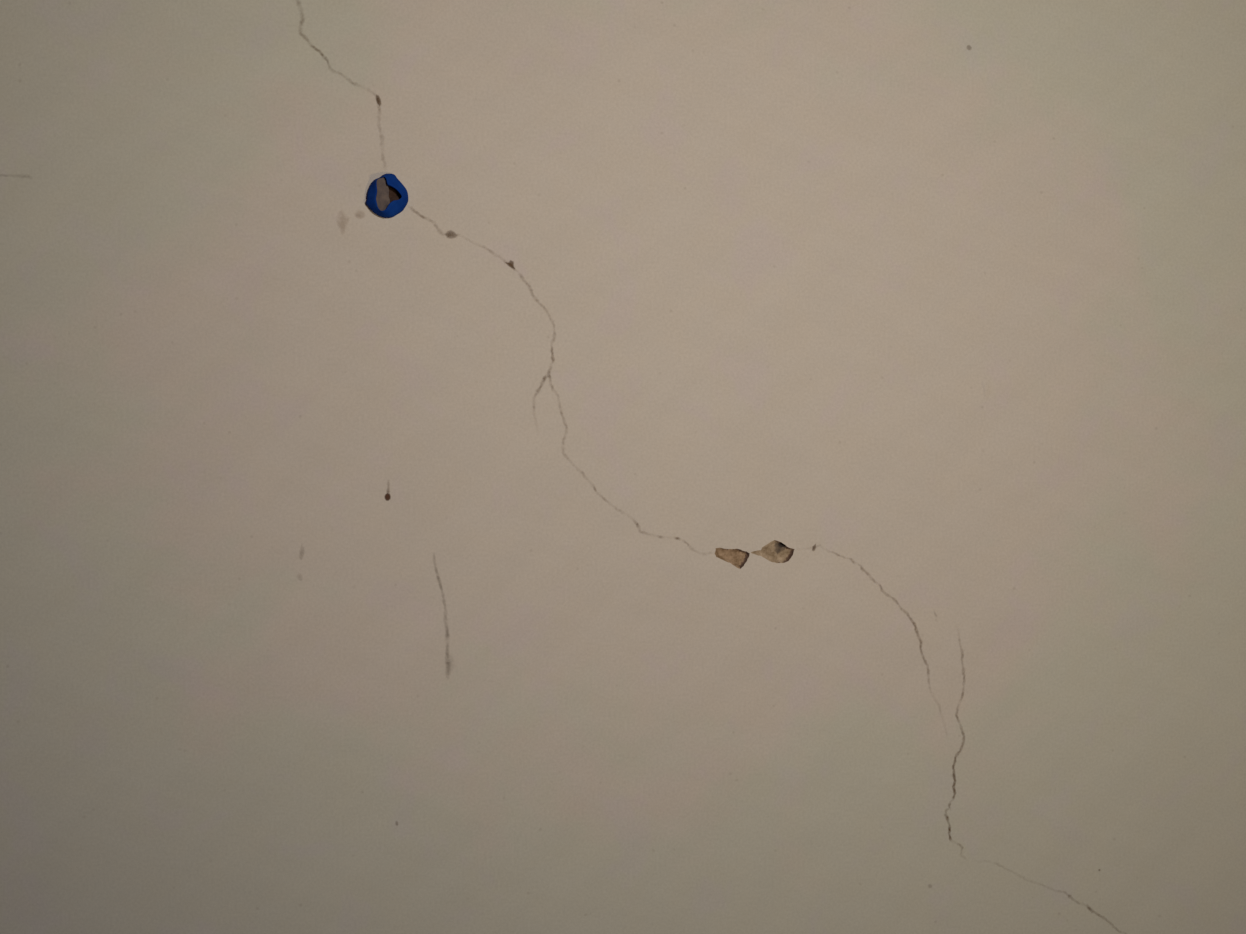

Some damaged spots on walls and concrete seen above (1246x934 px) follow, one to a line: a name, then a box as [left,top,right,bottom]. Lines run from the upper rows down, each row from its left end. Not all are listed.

spalling [715,540,794,569]